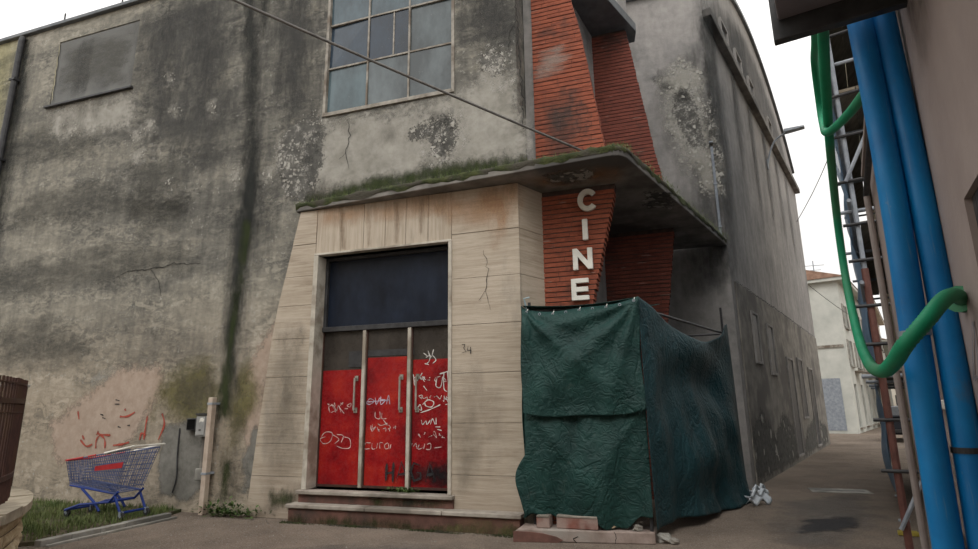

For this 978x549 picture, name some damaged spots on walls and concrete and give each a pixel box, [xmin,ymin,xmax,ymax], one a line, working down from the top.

water stain [6,45,86,169]
water stain [244,0,266,107]
flaking render [408,105,469,169]
crack [114,262,200,295]
water stain [218,119,259,417]